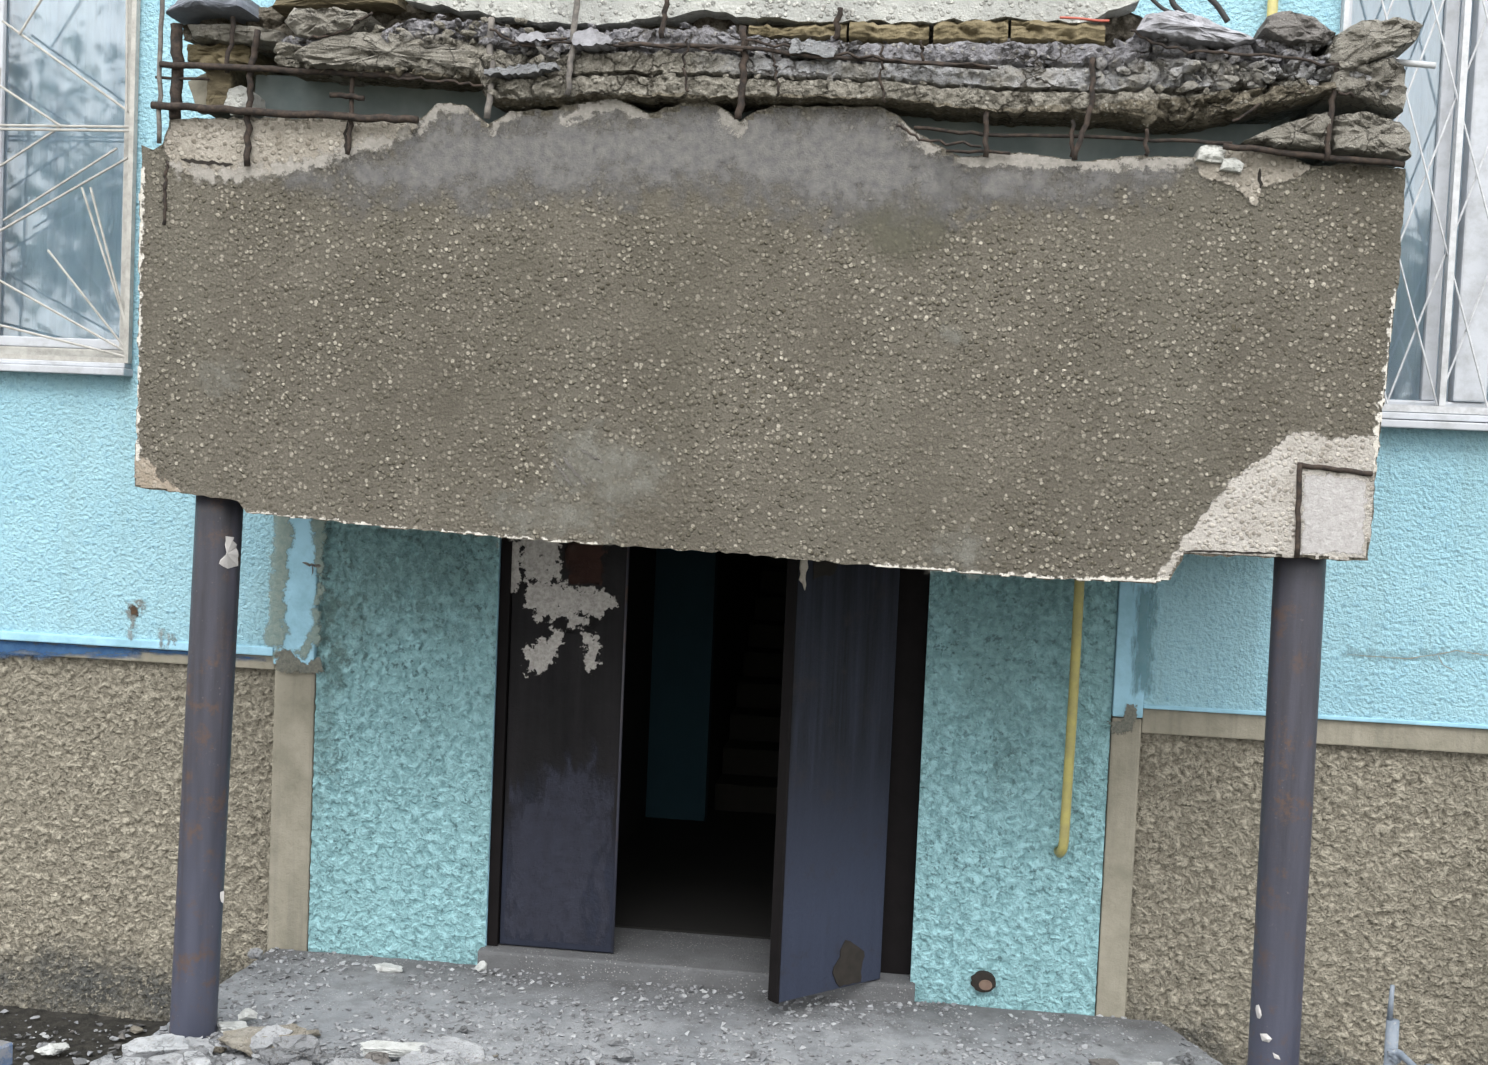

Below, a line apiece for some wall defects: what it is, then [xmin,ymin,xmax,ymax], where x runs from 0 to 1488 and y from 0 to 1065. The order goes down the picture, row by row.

peeling [134,0,1405,492]
spalling [869,288,1396,583]
rust [126,600,145,628]
peeling [219,536,239,569]
peeling [248,511,619,678]